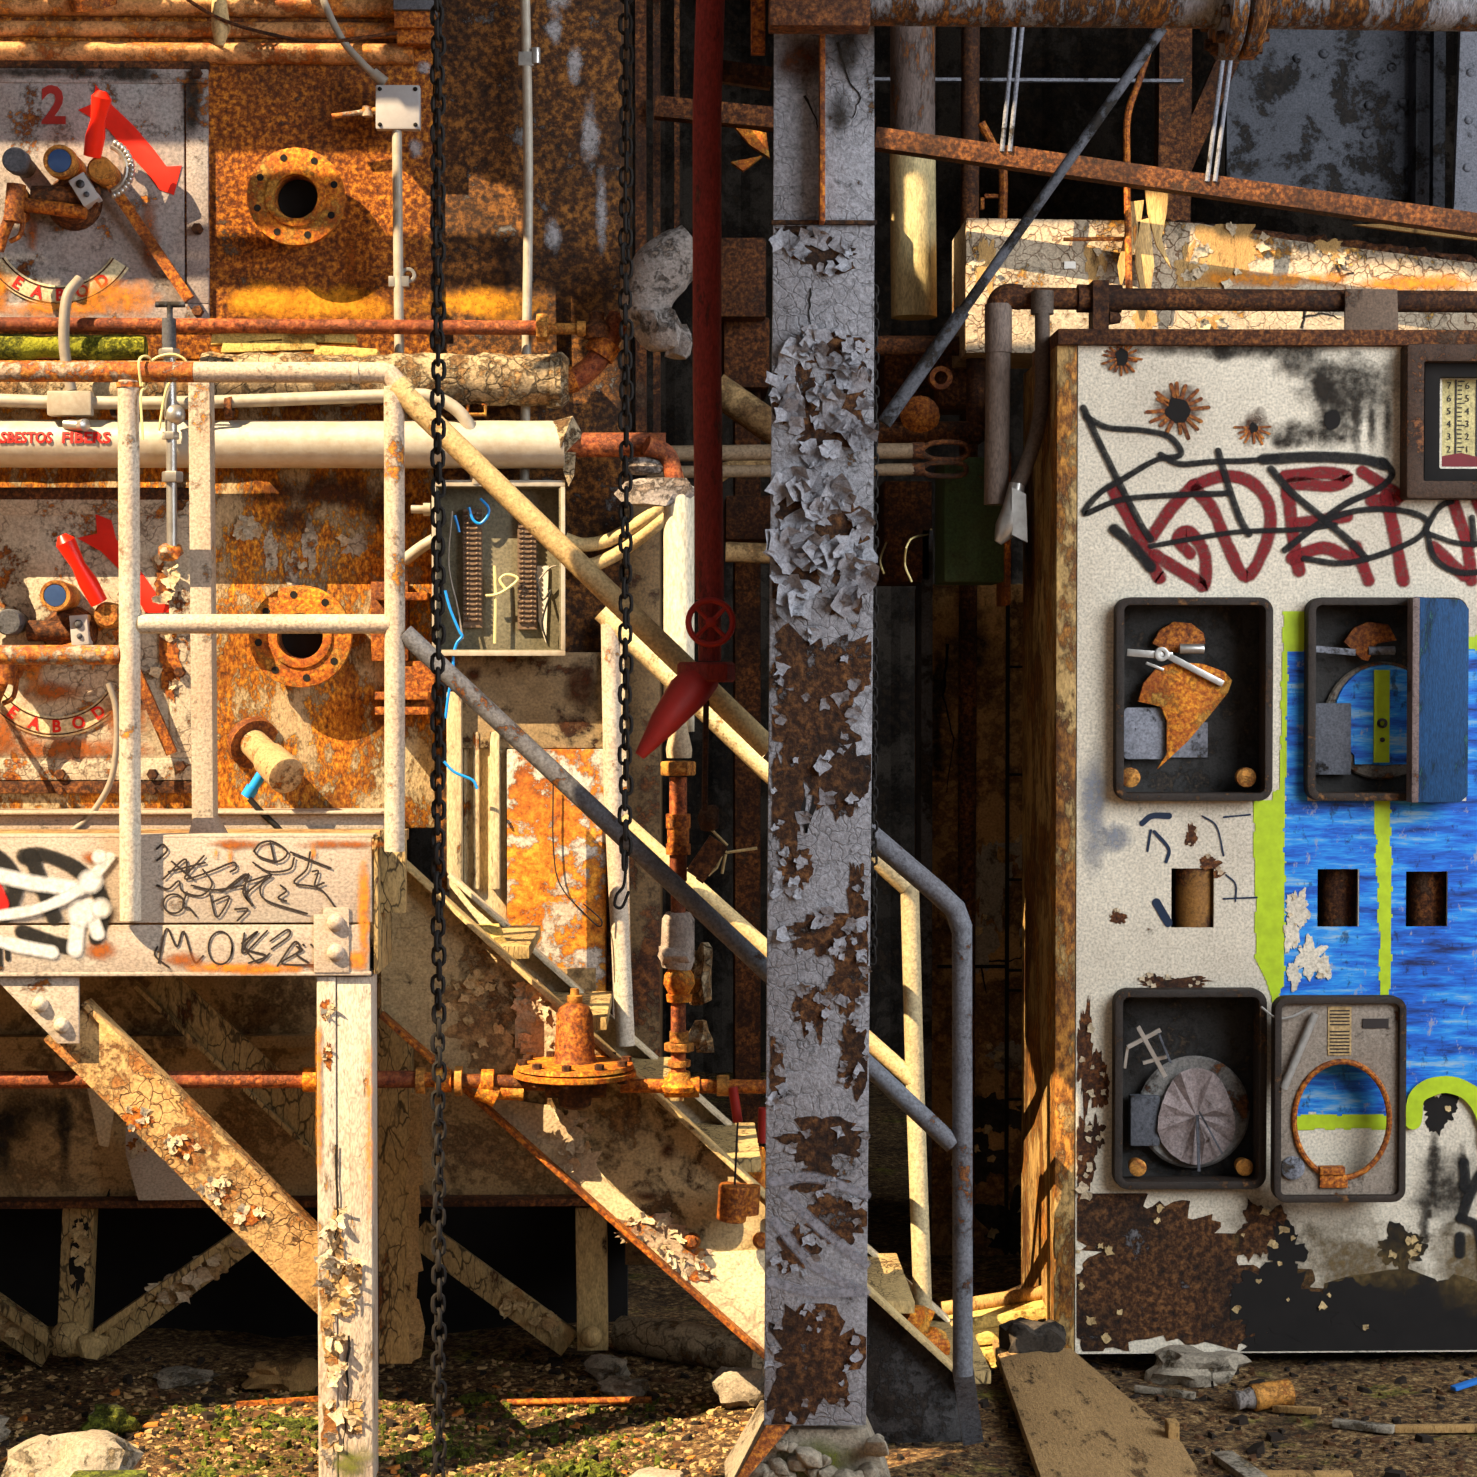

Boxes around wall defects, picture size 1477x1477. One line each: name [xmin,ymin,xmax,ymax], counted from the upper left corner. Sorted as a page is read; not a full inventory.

peeling [769,225,857,277]
corrosion [232,284,385,316]
corrosion [443,291,513,315]
crack [1300,265,1354,329]
corrosion [250,478,384,532]
peeling [763,323,880,1102]
peeling [1283,887,1332,992]
peeling [121,1105,201,1161]
peeling [765,1036,871,1276]
spalling [417,1206,591,1337]
spalling [1377,1221,1428,1269]
spalling [0,1174,379,1468]